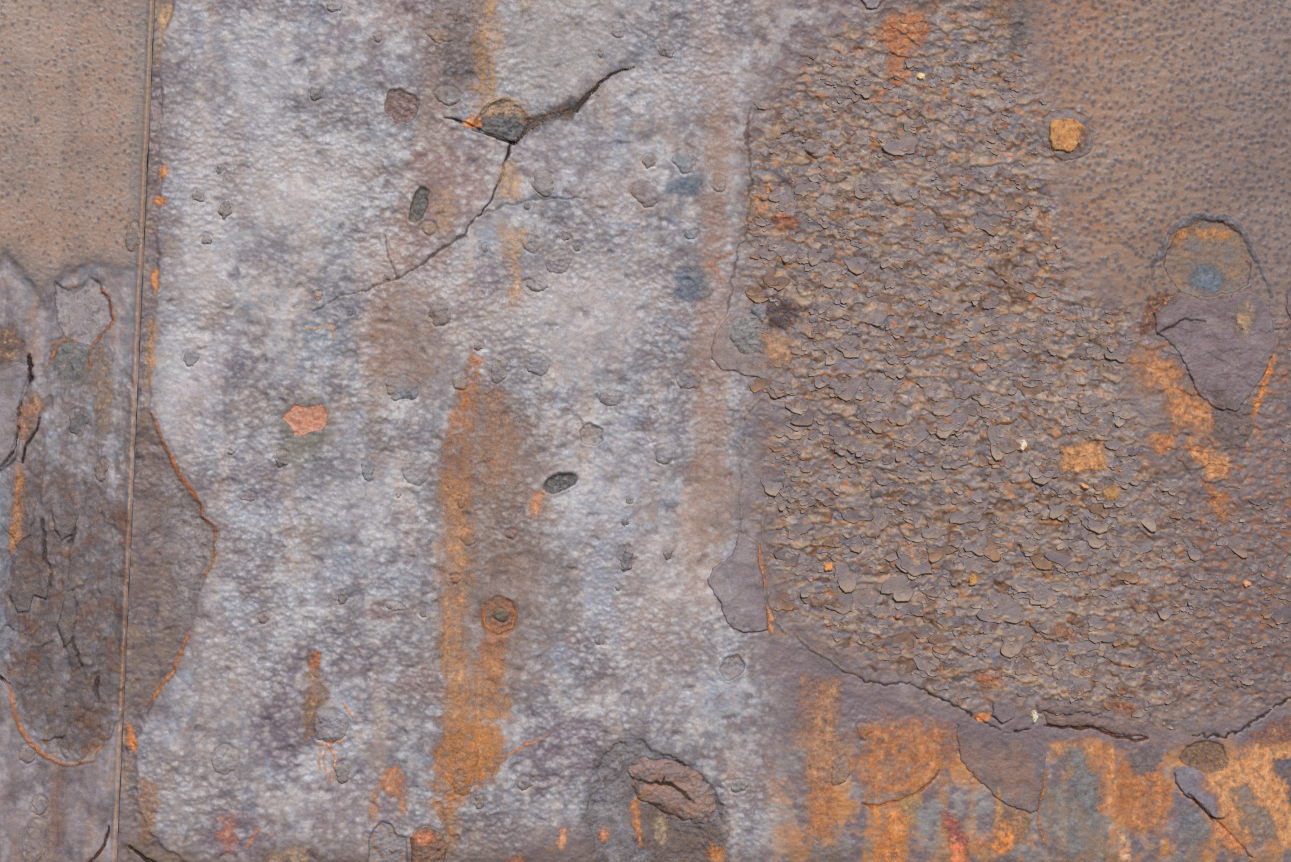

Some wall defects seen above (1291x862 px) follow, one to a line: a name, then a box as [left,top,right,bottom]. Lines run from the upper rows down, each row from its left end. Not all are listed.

rust [425,0,501,109]
crack [330,66,635,302]
spalling [1150,212,1273,297]
crack [4,354,41,464]
rust [282,404,328,436]
rust [706,0,1291,862]
spalling [0,478,118,733]
crack [41,519,99,701]
rust [368,341,550,862]
crack [0,675,103,765]
crack [1192,697,1291,739]
spalling [584,738,723,862]